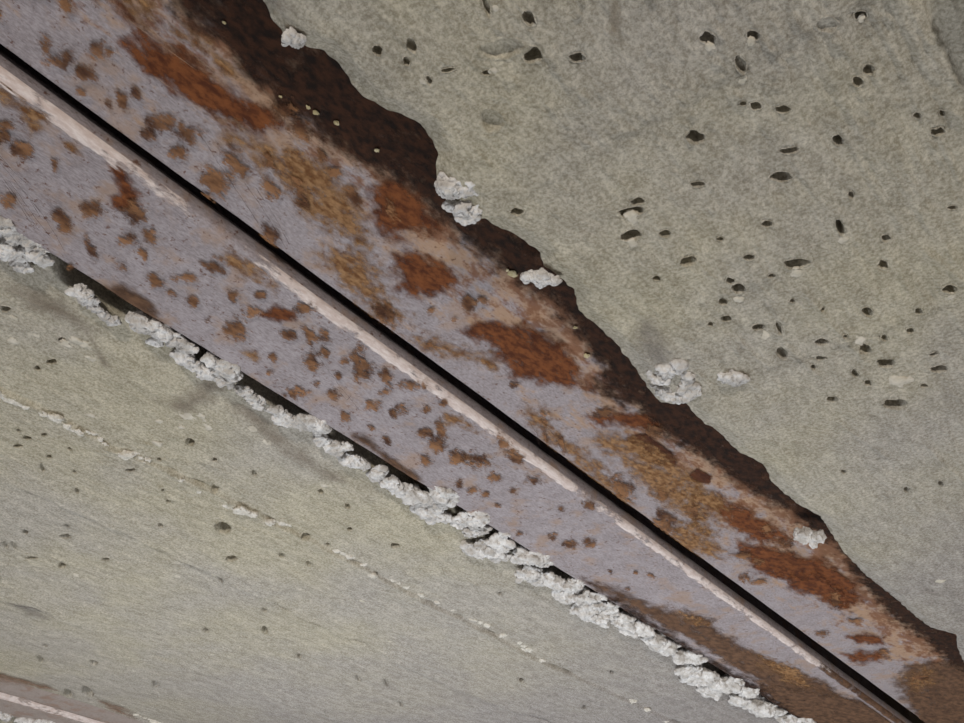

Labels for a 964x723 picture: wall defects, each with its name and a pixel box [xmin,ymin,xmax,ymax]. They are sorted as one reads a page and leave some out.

rust [36,35,115,97]
rust [0,83,46,159]
spalling [684,128,708,146]
spalling [738,100,793,114]
rust [51,166,156,261]
peeling [434,172,479,200]
spalling [614,196,649,243]
rust [113,0,864,610]
hole [857,334,898,369]
spalling [64,255,831,723]
rust [584,580,904,723]
rust [837,546,964,723]